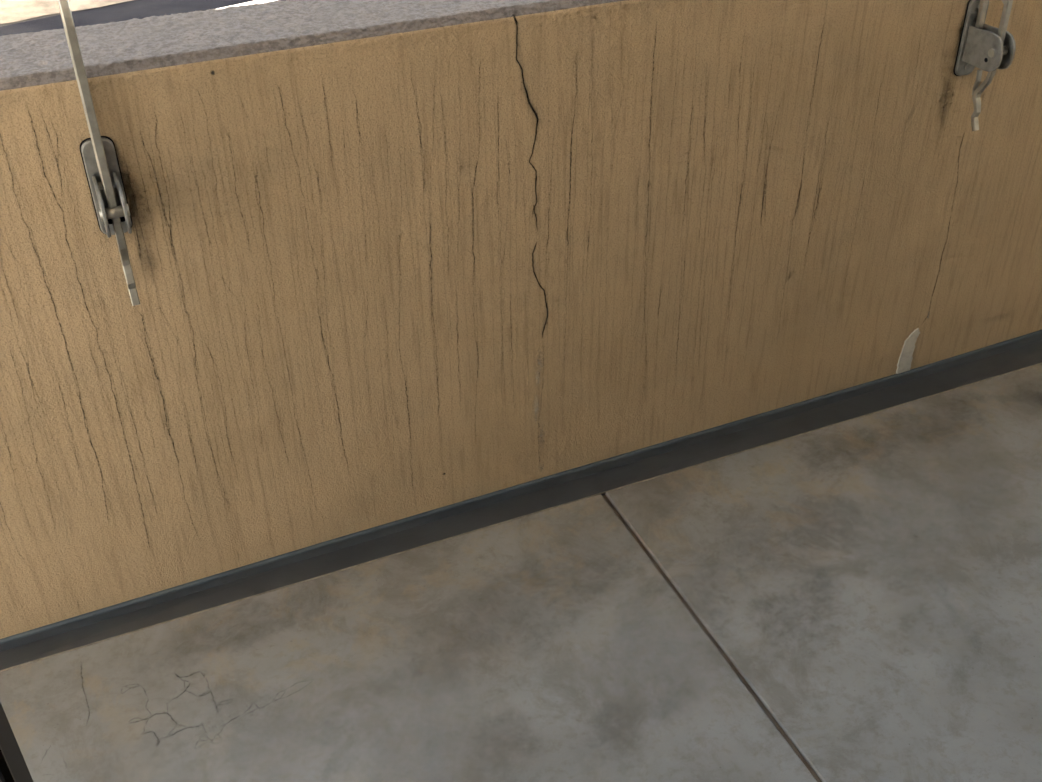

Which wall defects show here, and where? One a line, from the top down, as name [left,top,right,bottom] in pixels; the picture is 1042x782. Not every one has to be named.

crack [513,15,548,462]